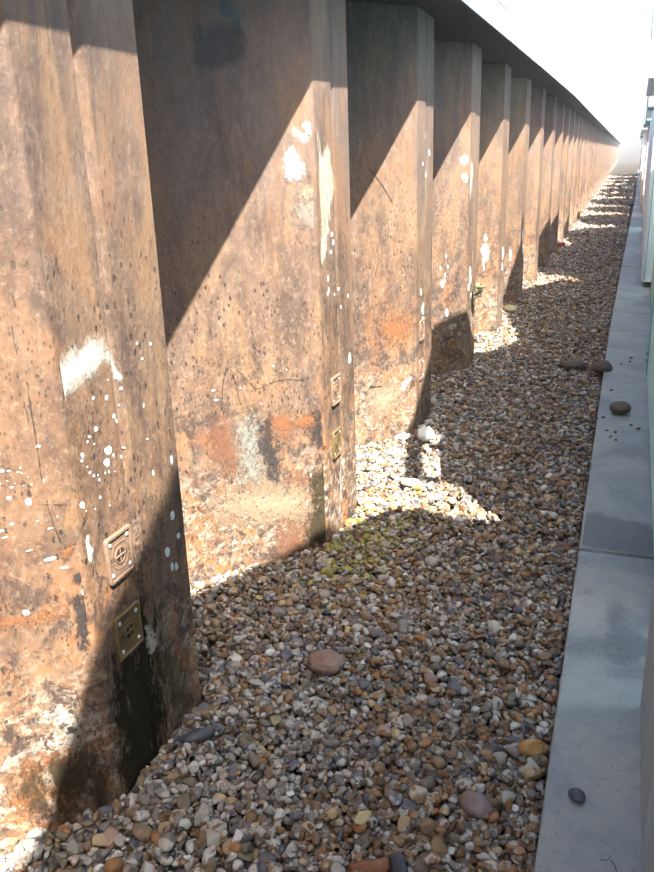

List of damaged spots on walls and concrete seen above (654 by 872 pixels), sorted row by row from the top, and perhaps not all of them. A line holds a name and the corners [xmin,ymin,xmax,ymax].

water stain [68,594,89,650]
water stain [22,603,176,822]